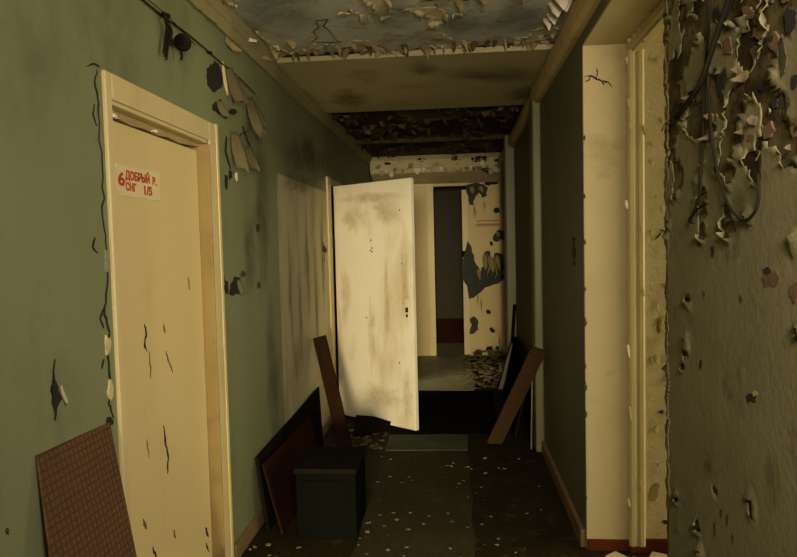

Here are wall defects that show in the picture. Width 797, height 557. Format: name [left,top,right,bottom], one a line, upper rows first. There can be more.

peeling [206,61,267,190]
peeling [332,106,519,213]
crack [584,68,612,87]
peeling [462,229,504,299]
peeling [627,0,797,557]
peeling [50,374,69,416]